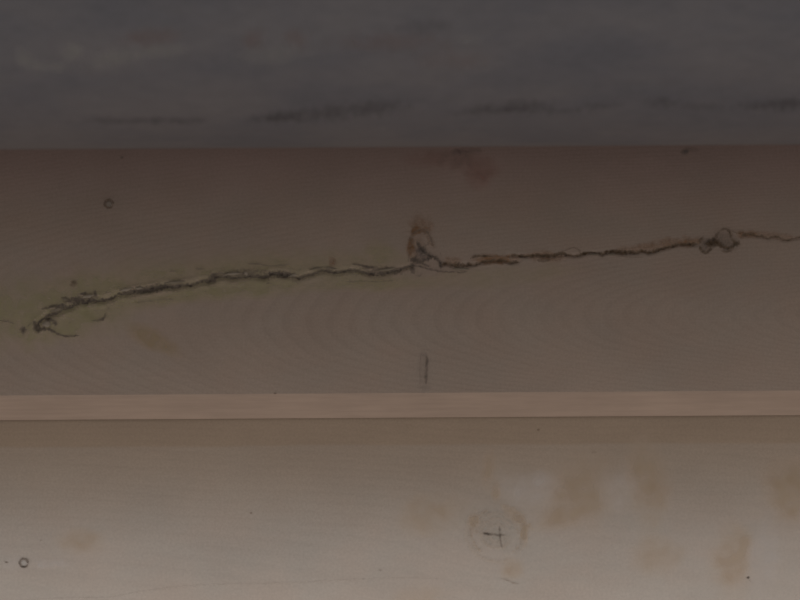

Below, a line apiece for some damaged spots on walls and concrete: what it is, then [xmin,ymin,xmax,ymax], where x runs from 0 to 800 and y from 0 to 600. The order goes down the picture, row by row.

crack [442,242,696,270]
crack [22,263,412,337]